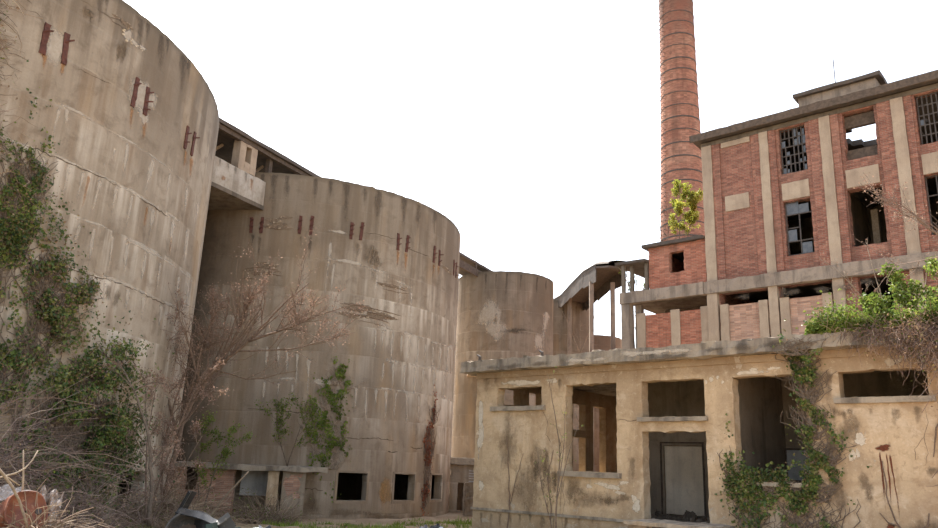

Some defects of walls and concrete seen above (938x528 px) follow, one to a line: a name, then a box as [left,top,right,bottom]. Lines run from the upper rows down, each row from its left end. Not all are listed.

spalling [112,14,145,51]
crack [27,146,121,188]
rust [875,444,899,508]